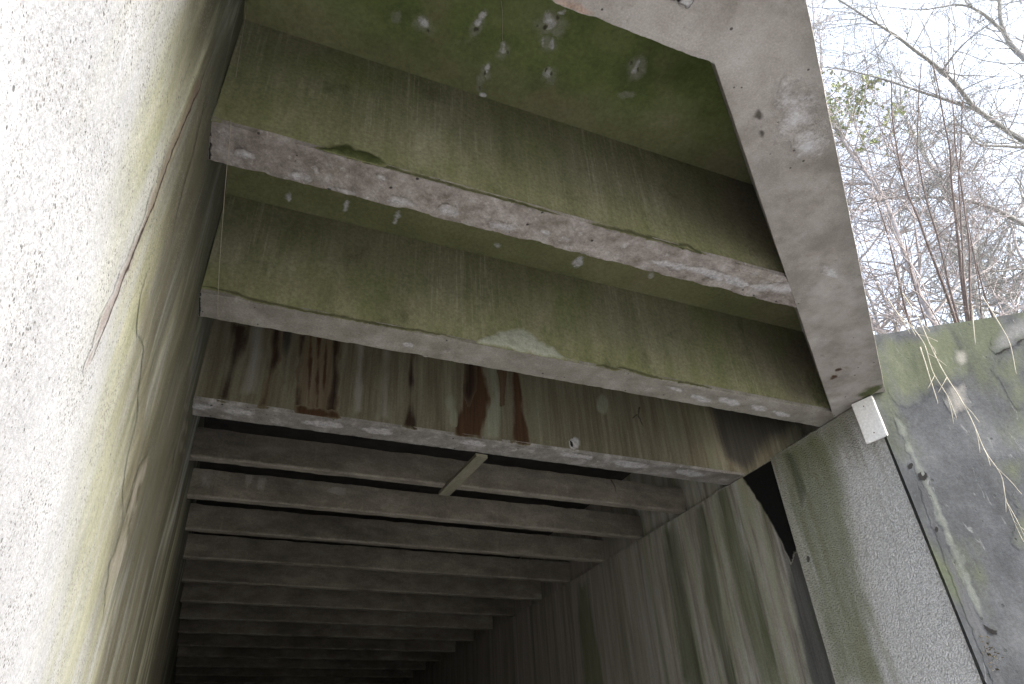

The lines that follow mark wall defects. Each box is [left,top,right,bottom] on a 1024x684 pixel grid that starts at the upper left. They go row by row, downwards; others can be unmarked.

spalling [389,9,438,39]
spalling [452,7,490,46]
spalling [475,40,513,97]
spalling [530,0,597,89]
spalling [615,52,648,100]
crack [83,72,213,373]
corrosion [294,334,342,420]
corrosion [454,363,531,446]